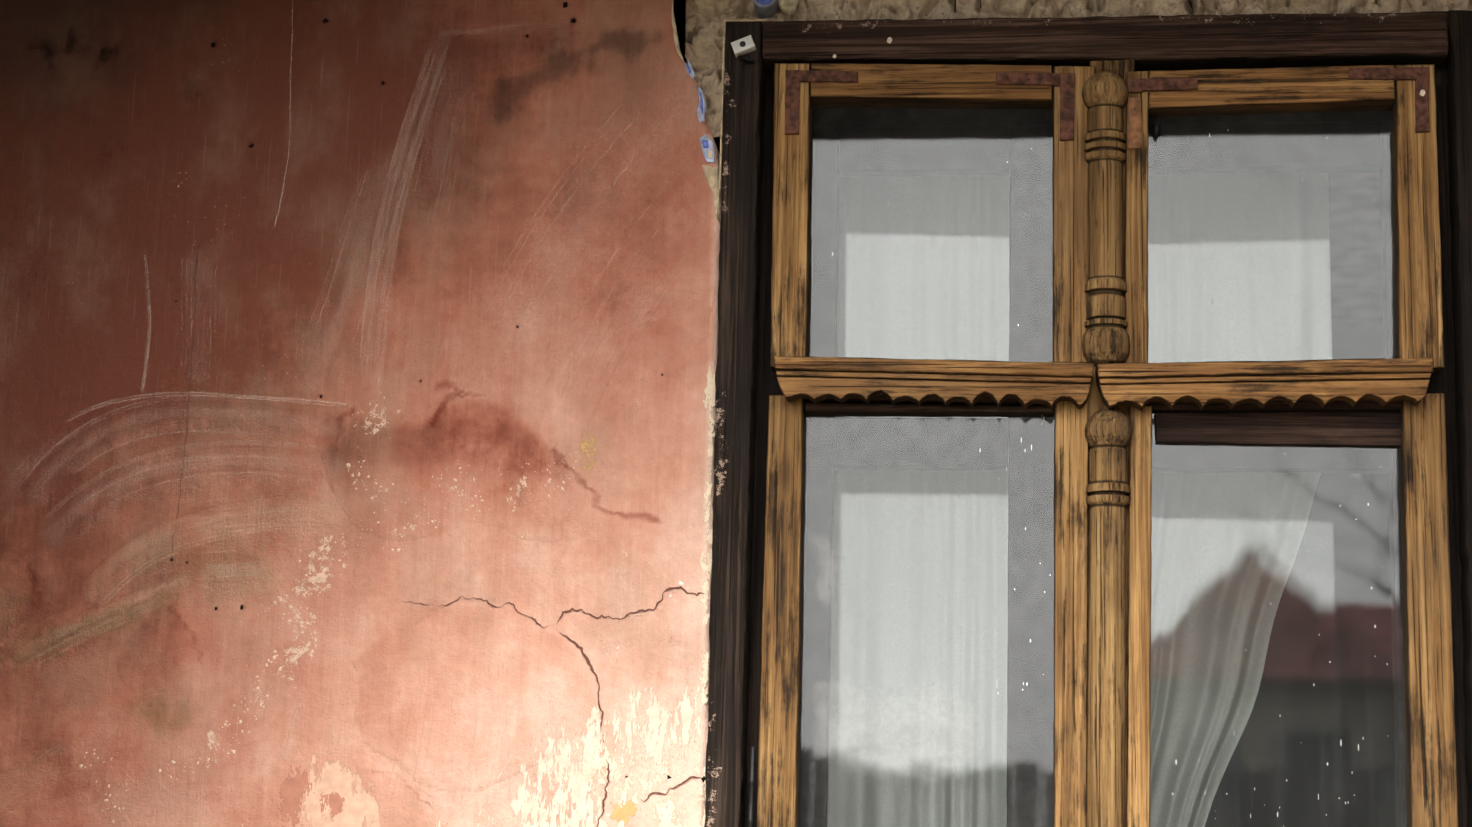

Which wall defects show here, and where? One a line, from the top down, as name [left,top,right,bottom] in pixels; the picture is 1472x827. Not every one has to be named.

spalling [672,0,720,223]
peeling [294,754,381,827]
damp [159,392,602,788]
crack [405,581,705,827]
peeling [477,357,716,827]